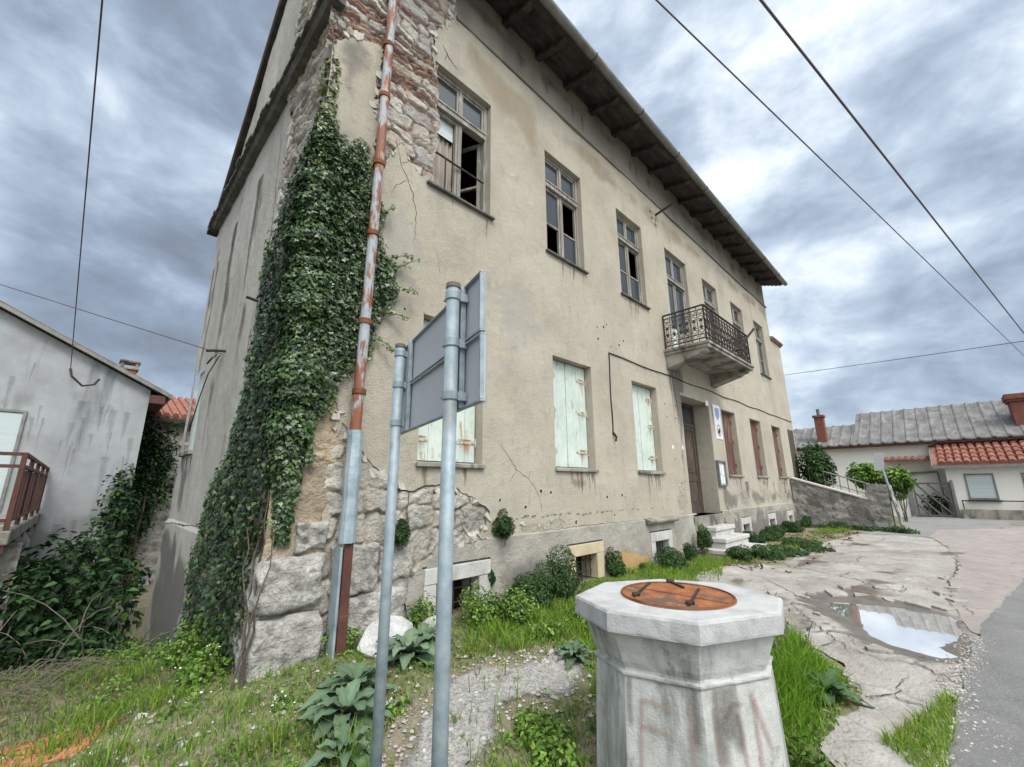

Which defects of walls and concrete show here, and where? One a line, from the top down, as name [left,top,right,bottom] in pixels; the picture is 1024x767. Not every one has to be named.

crack [392,139,417,241]
spalling [256,0,456,656]
spalling [453,487,492,548]
crack [502,447,640,532]
crack [758,538,973,706]